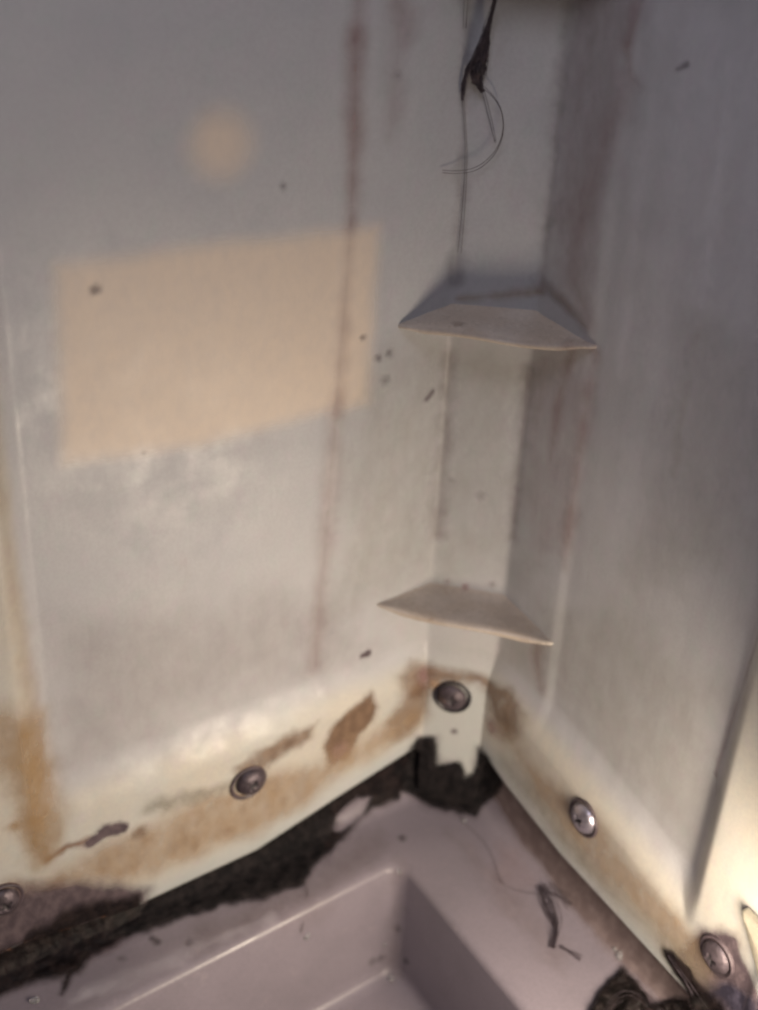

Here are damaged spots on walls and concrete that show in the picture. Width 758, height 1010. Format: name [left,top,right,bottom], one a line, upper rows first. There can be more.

corrosion [237,727,313,777]
corrosion [323,692,377,763]
corrosion [387,663,520,741]
corrosion [47,821,145,862]
leakage [0,711,504,995]